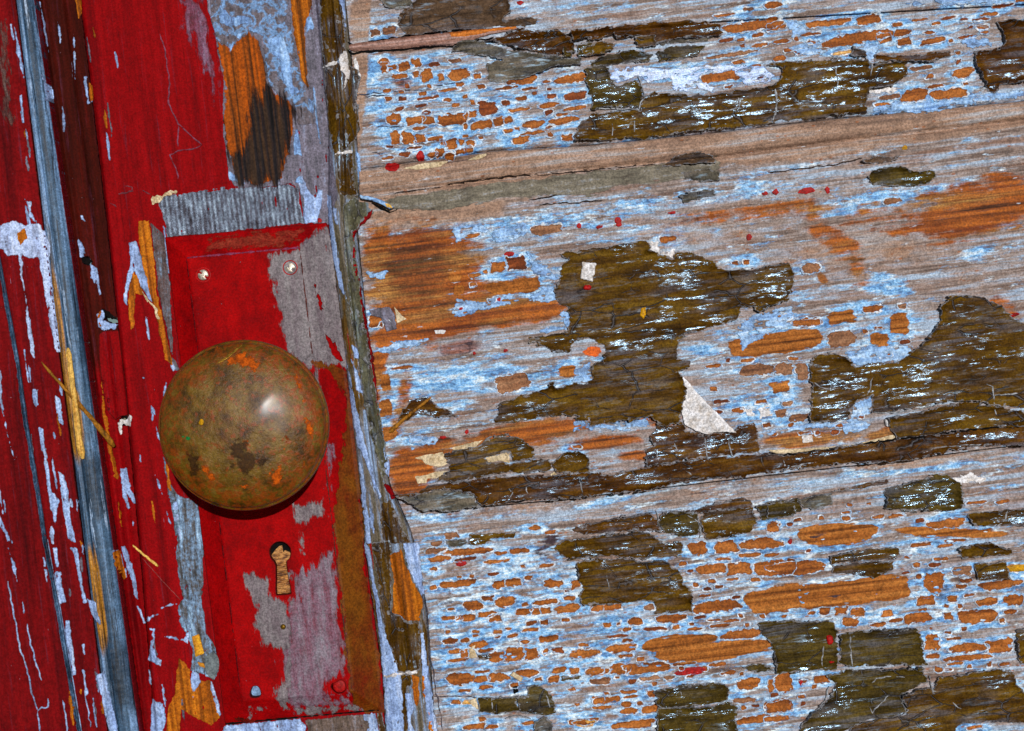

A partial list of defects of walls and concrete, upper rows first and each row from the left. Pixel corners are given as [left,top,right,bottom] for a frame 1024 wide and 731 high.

peeling [0,23,15,125]
peeling [369,0,1024,170]
peeling [0,221,61,358]
peeling [123,0,429,499]
peeling [450,222,564,243]
peeling [99,330,132,435]
corrosion [227,351,260,372]
corrosion [186,452,215,481]
corrosion [231,438,283,489]
peeling [223,235,1024,731]